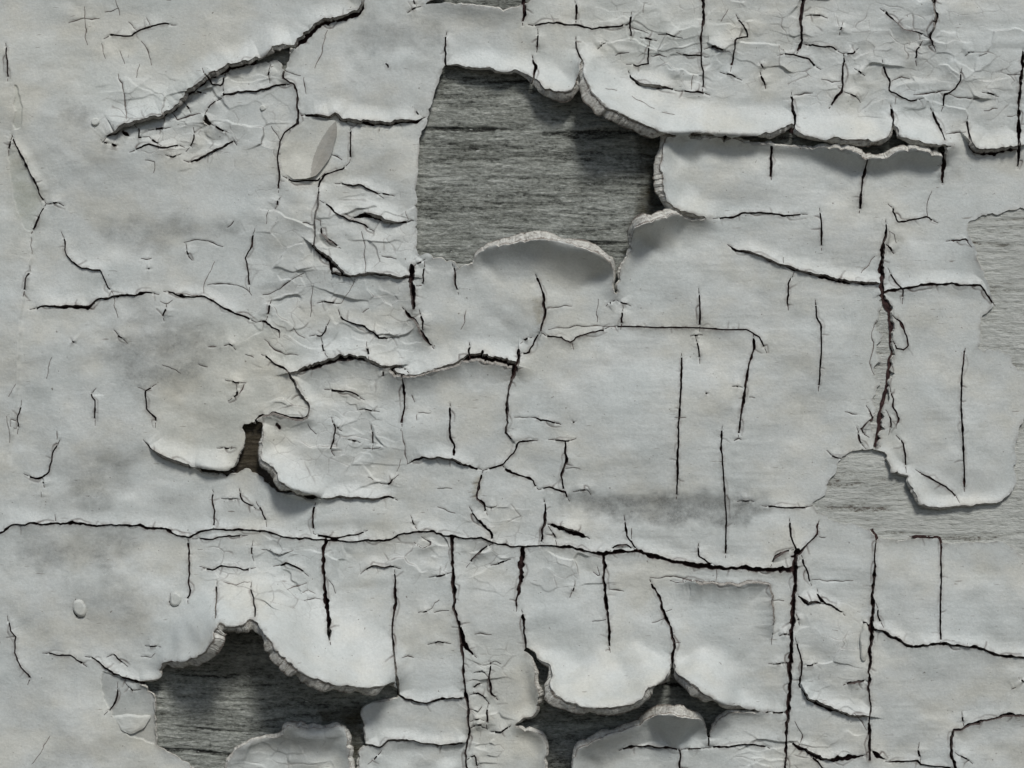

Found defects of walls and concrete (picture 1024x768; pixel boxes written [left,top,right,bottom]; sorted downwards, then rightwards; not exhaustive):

crack [23,0,434,447]
peeling [415,41,951,343]
crack [521,0,1024,503]
peeling [967,208,1024,373]
peeling [159,418,340,499]
crack [1,264,1022,768]
peeling [812,295,1024,556]
peeling [102,610,463,768]
peeling [491,589,770,768]